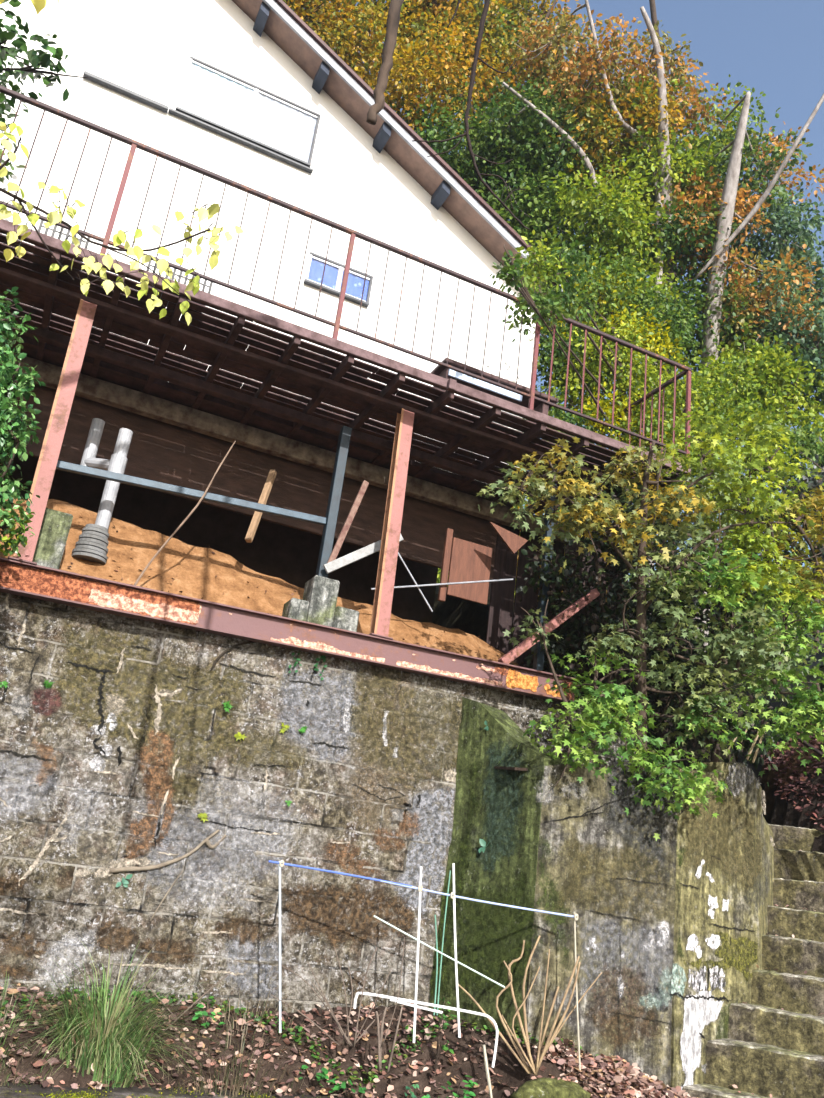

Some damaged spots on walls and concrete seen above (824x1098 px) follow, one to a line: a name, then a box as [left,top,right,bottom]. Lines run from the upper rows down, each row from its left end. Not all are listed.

corrosion [0,561,202,625]
crack [0,642,40,683]
corrosion [270,624,573,700]
crack [219,663,321,706]
crack [66,662,122,766]
crack [0,750,51,761]
crack [313,741,348,749]
leakage [708,896,729,919]
leakage [686,934,720,959]